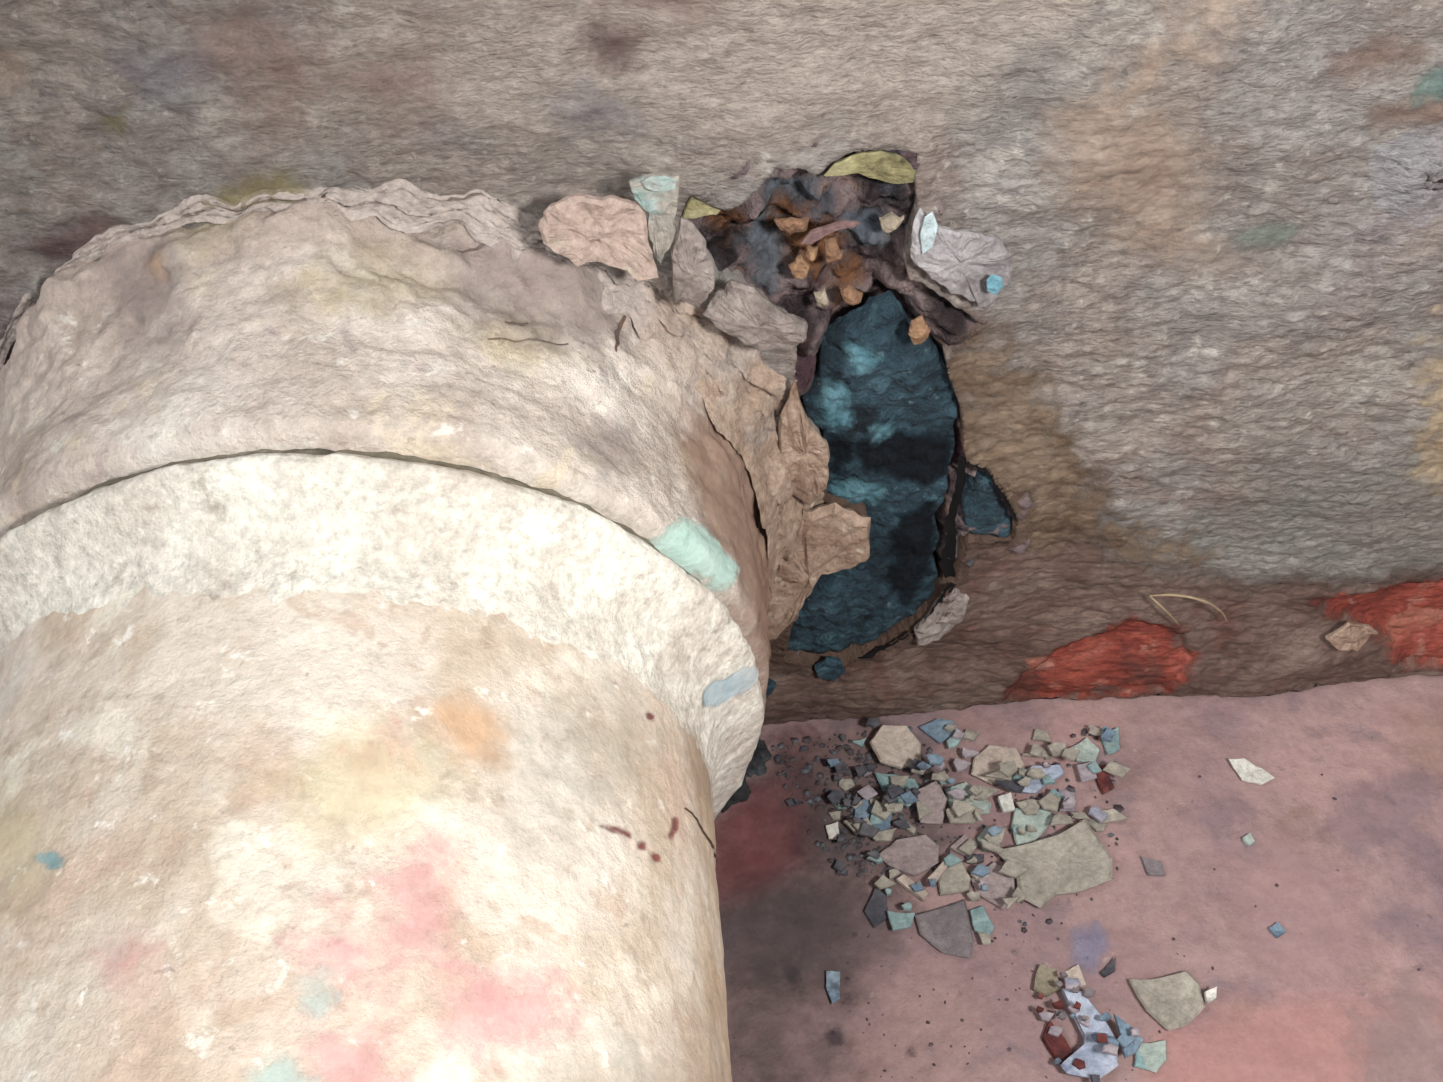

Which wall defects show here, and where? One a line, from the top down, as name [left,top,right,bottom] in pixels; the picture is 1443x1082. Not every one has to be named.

spalling [629,150,1036,682]
spalling [766,678,776,699]
peeling [1003,617,1198,701]
peeling [1308,579,1443,670]
crack [685,807,717,862]